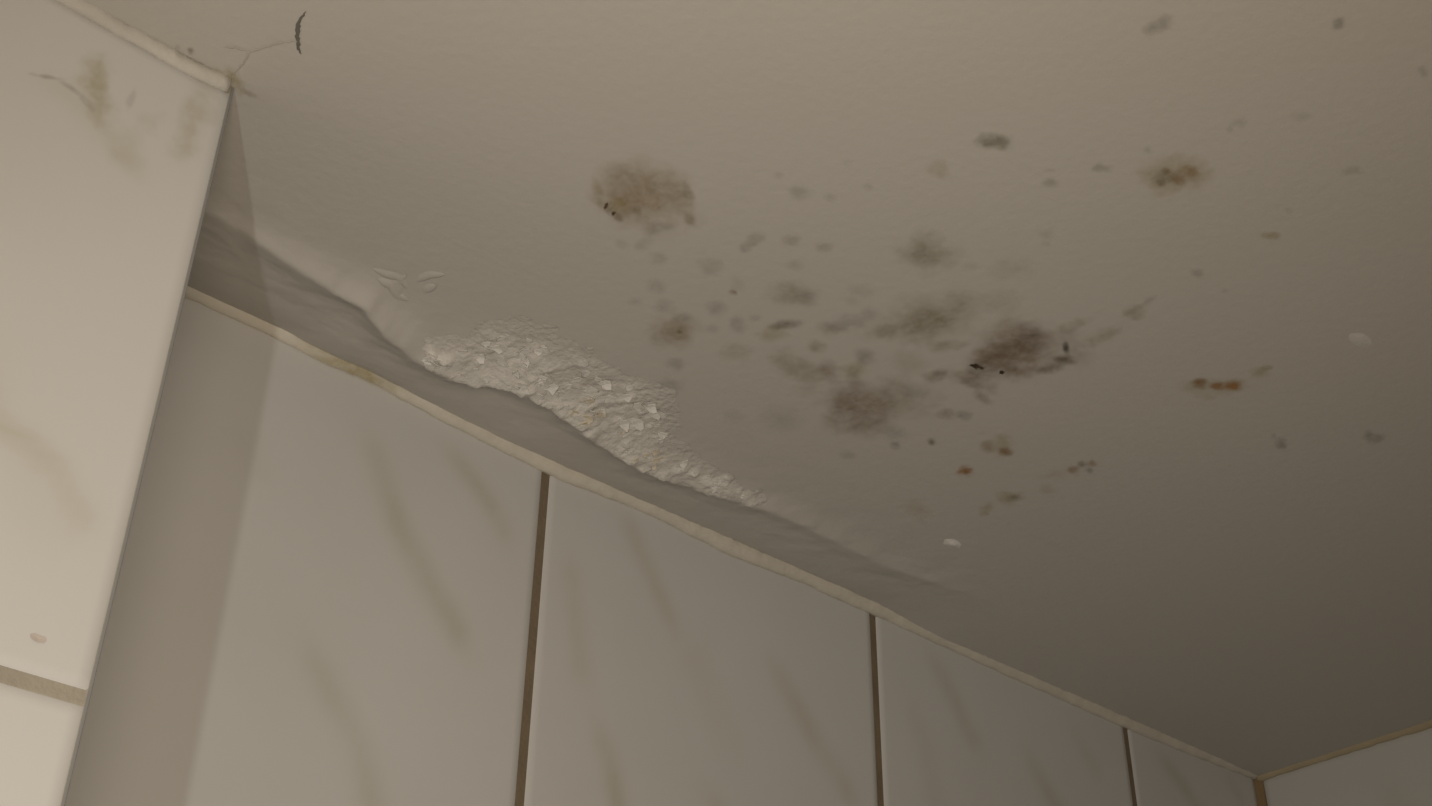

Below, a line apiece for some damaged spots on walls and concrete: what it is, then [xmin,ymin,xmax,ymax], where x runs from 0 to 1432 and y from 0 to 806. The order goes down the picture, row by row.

peeling [421,314,768,508]